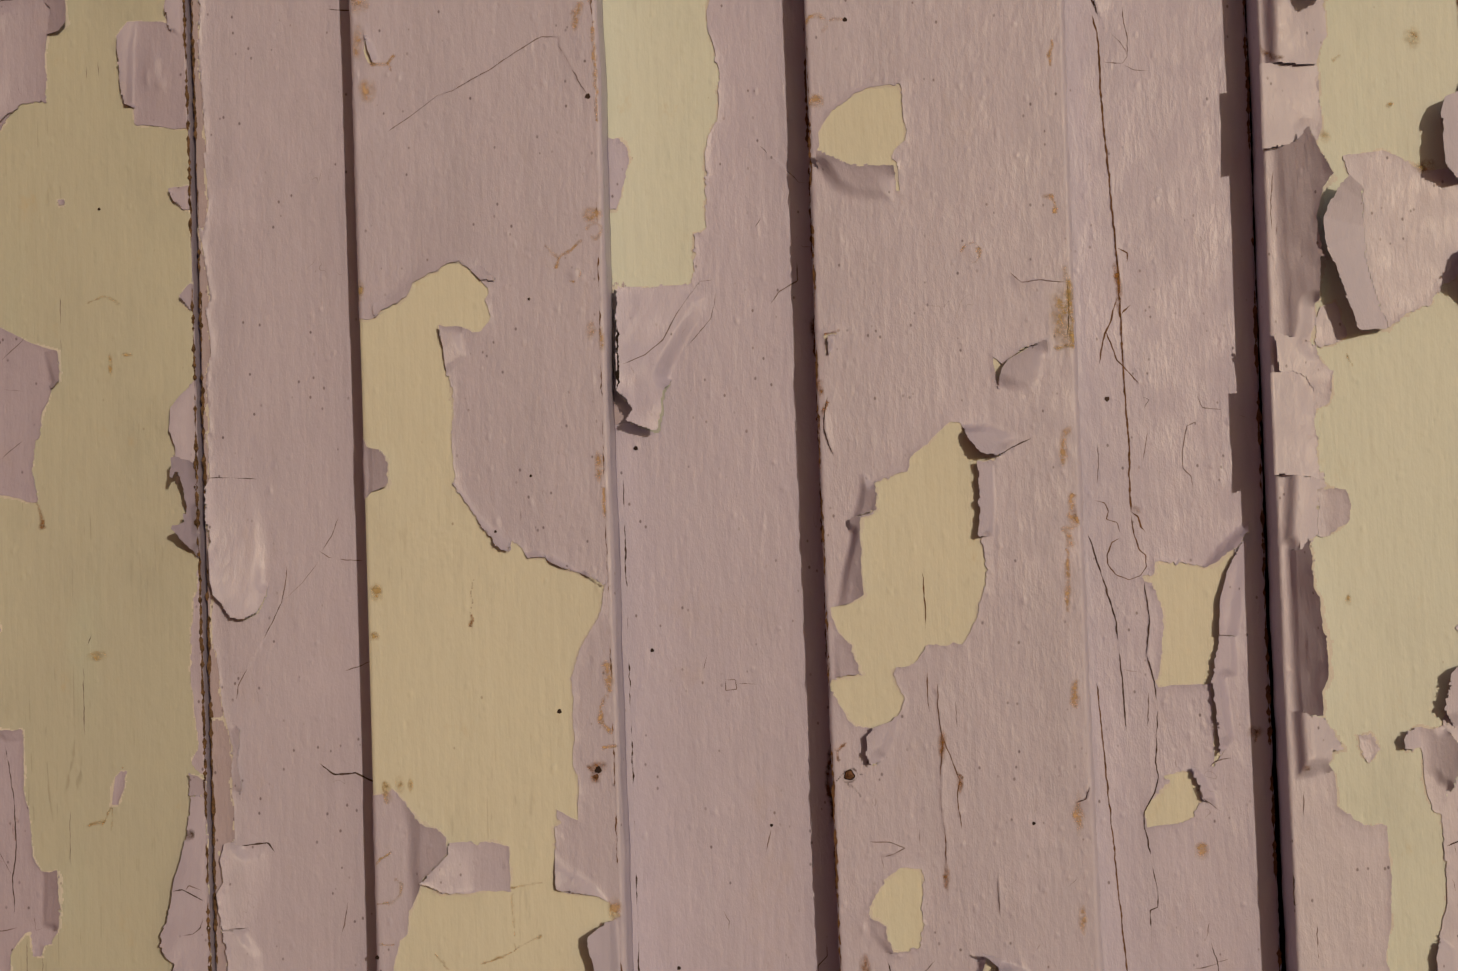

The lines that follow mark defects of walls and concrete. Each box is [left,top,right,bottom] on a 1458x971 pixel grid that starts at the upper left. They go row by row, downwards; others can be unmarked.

peeling [0,0,277,971]
peeling [360,242,624,971]
peeling [603,0,720,430]
peeling [816,86,905,208]
peeling [863,868,924,954]
peeling [829,421,1026,765]
crack [1001,273,1070,364]
crack [1076,7,1229,971]
peeling [1145,768,1222,827]
peeling [1150,518,1254,755]
crack [1182,398,1244,485]
peeling [1257,0,1458,971]